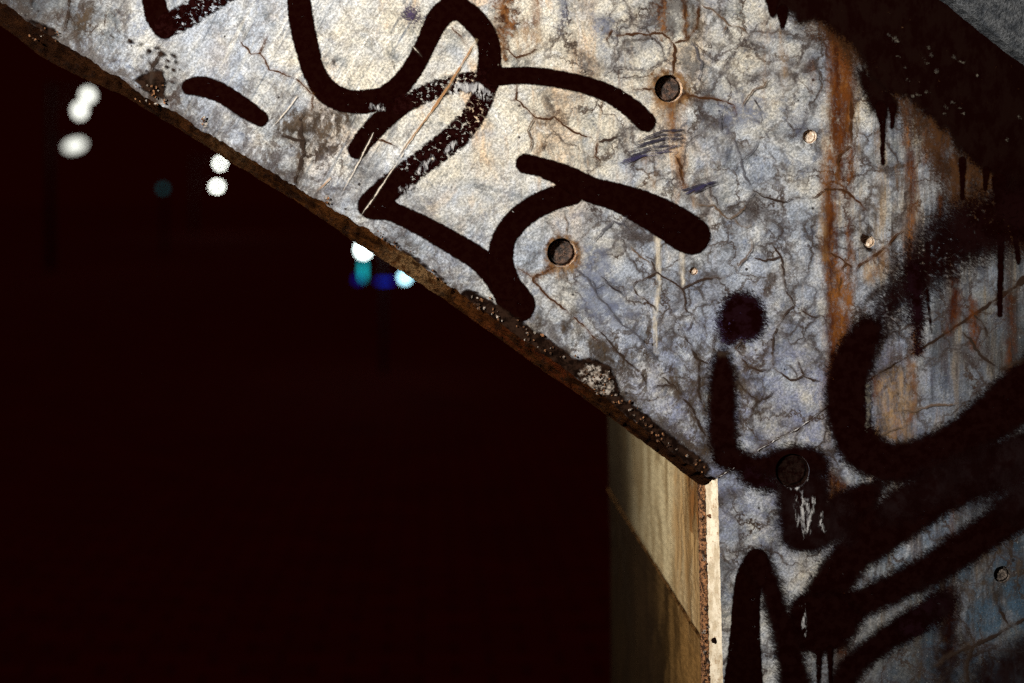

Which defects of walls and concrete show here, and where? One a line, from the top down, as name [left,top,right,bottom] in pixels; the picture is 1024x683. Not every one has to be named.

rust [492,0,518,62]
rust [654,0,670,41]
crack [241,37,313,184]
rust [650,70,690,129]
crack [513,4,863,435]
rust [822,28,856,378]
rust [532,236,581,282]
crack [830,231,902,290]
crack [962,314,1022,370]
crack [881,403,955,435]